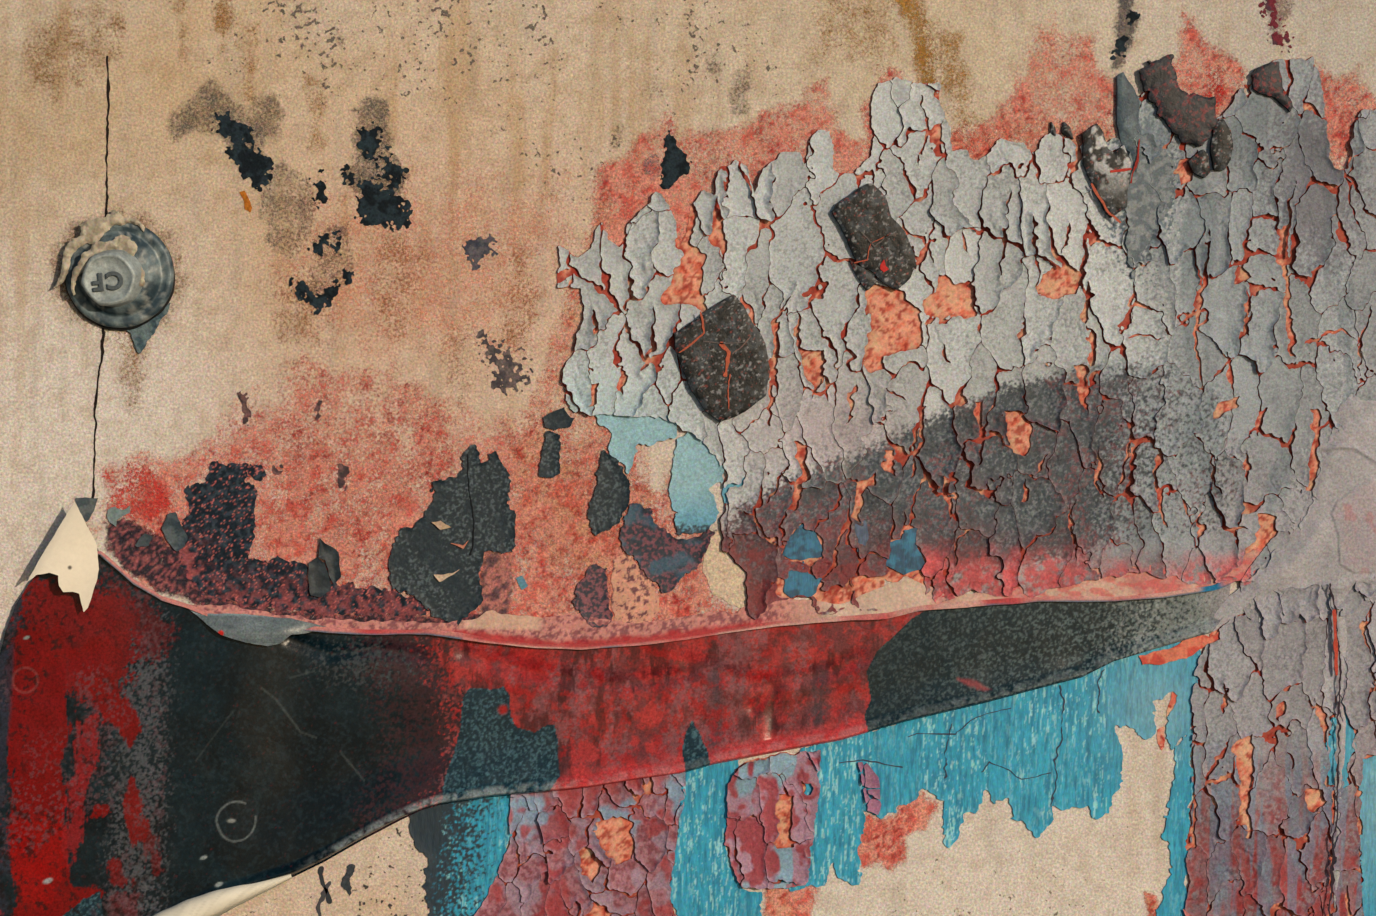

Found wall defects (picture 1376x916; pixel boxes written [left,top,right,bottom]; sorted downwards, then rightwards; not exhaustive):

crack [103,56,111,217]
crack [91,328,105,498]
peeling [237,391,251,426]
peeling [337,463,350,491]
peeling [539,0,1376,916]
peeling [135,512,188,551]
peeling [308,538,341,597]
peeling [474,772,686,916]
crack [316,866,332,916]